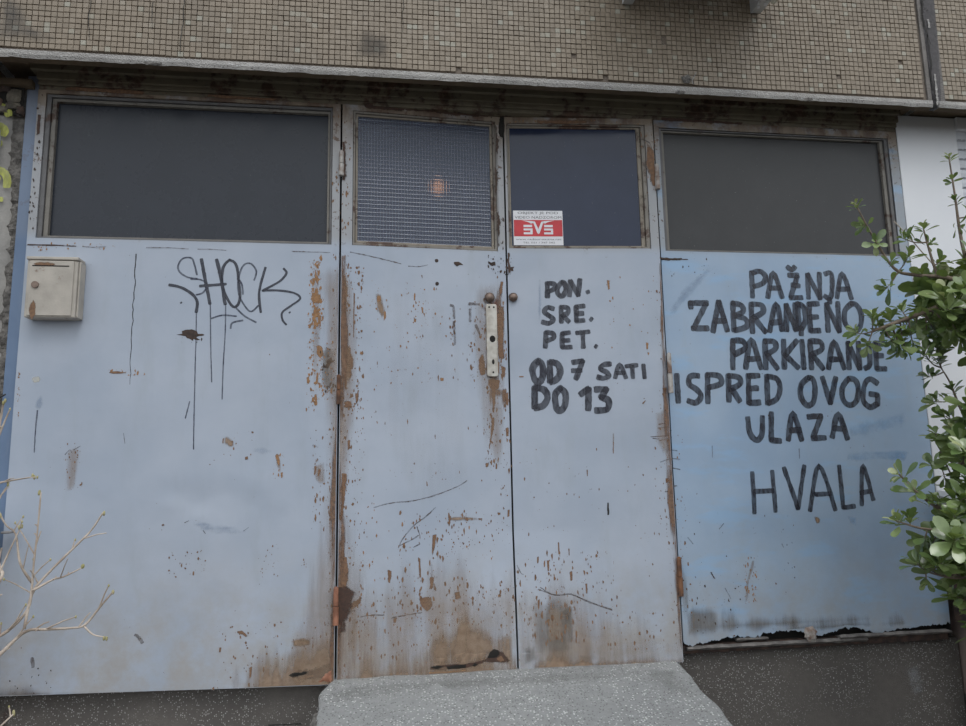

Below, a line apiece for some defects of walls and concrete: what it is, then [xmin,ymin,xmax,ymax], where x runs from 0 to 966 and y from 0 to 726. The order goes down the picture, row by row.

corrosion [27,242,75,265]
corrosion [217,252,664,687]
corrosion [641,257,716,641]